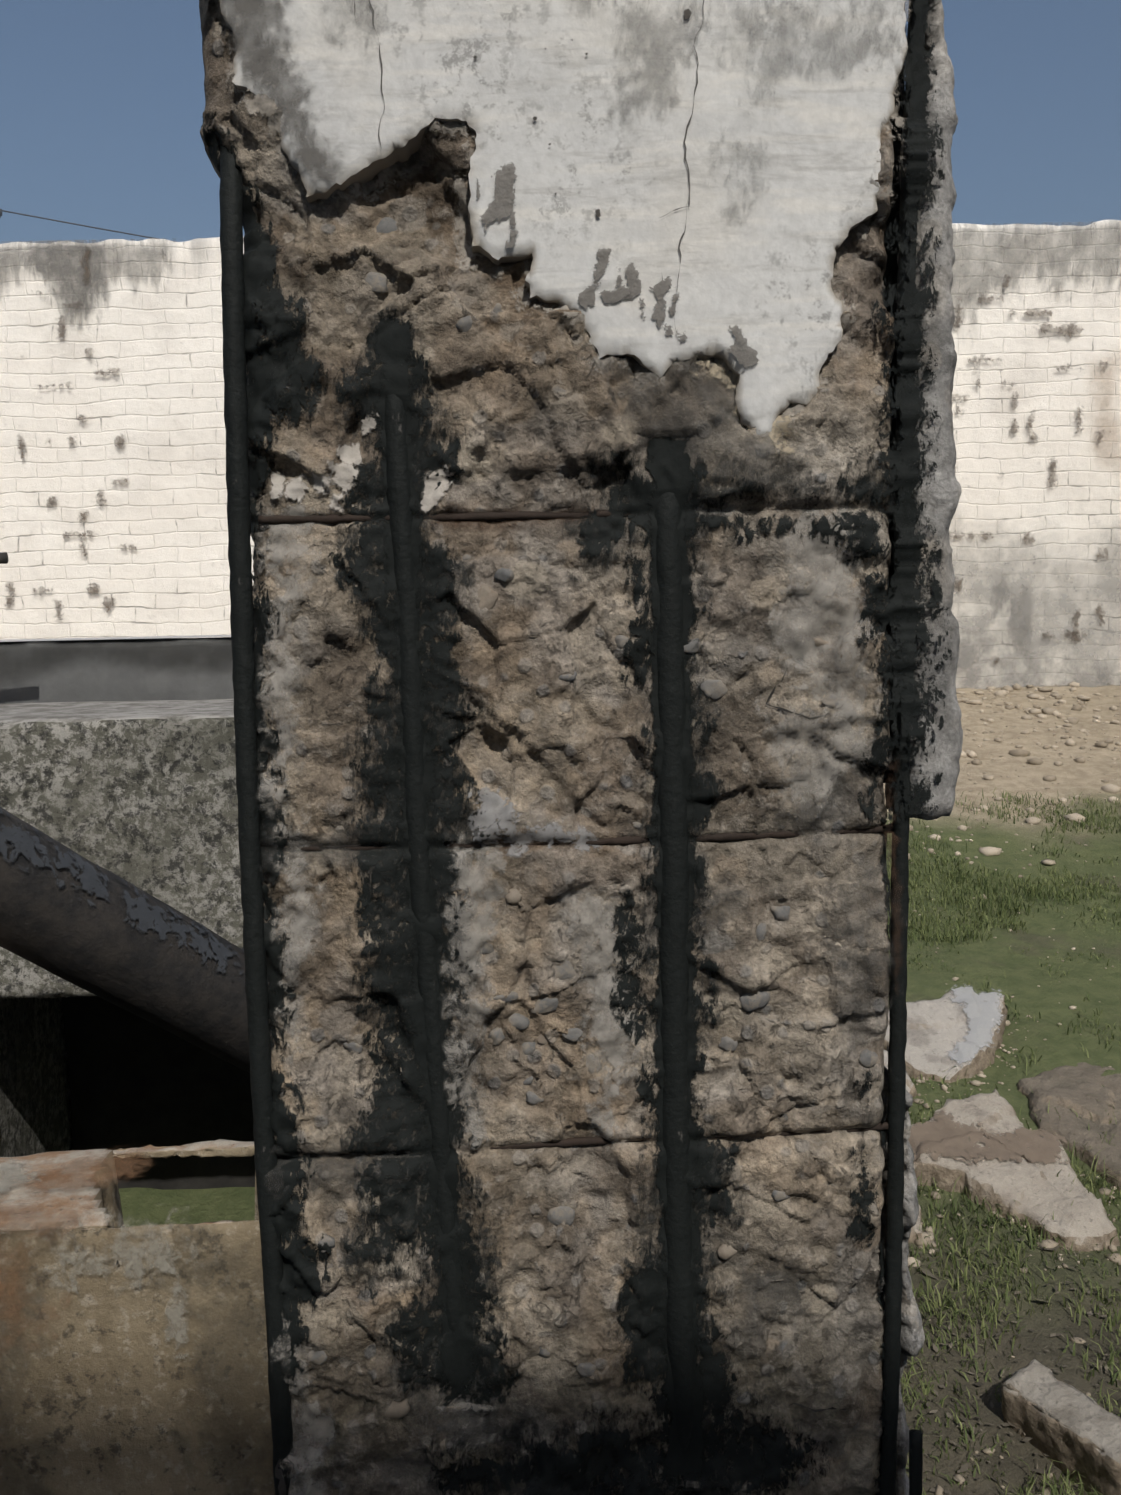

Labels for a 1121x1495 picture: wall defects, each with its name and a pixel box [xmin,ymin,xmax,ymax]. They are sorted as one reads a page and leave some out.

crack [354,0,385,149]
spalling [907,0,926,58]
crack [660,0,704,344]
spalling [121,0,918,1495]
peeling [0,807,111,906]
spalling [909,1429,923,1495]